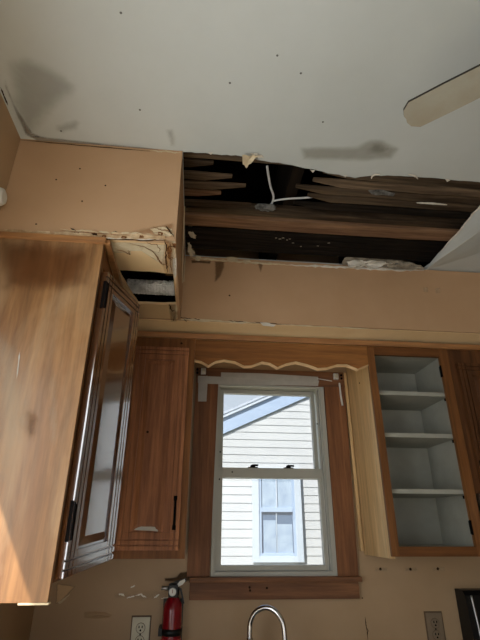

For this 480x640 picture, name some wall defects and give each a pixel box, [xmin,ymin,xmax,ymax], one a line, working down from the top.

peeling [242,153,264,168]
peeling [5,227,177,280]
crack [72,226,174,272]
spalling [190,256,425,272]